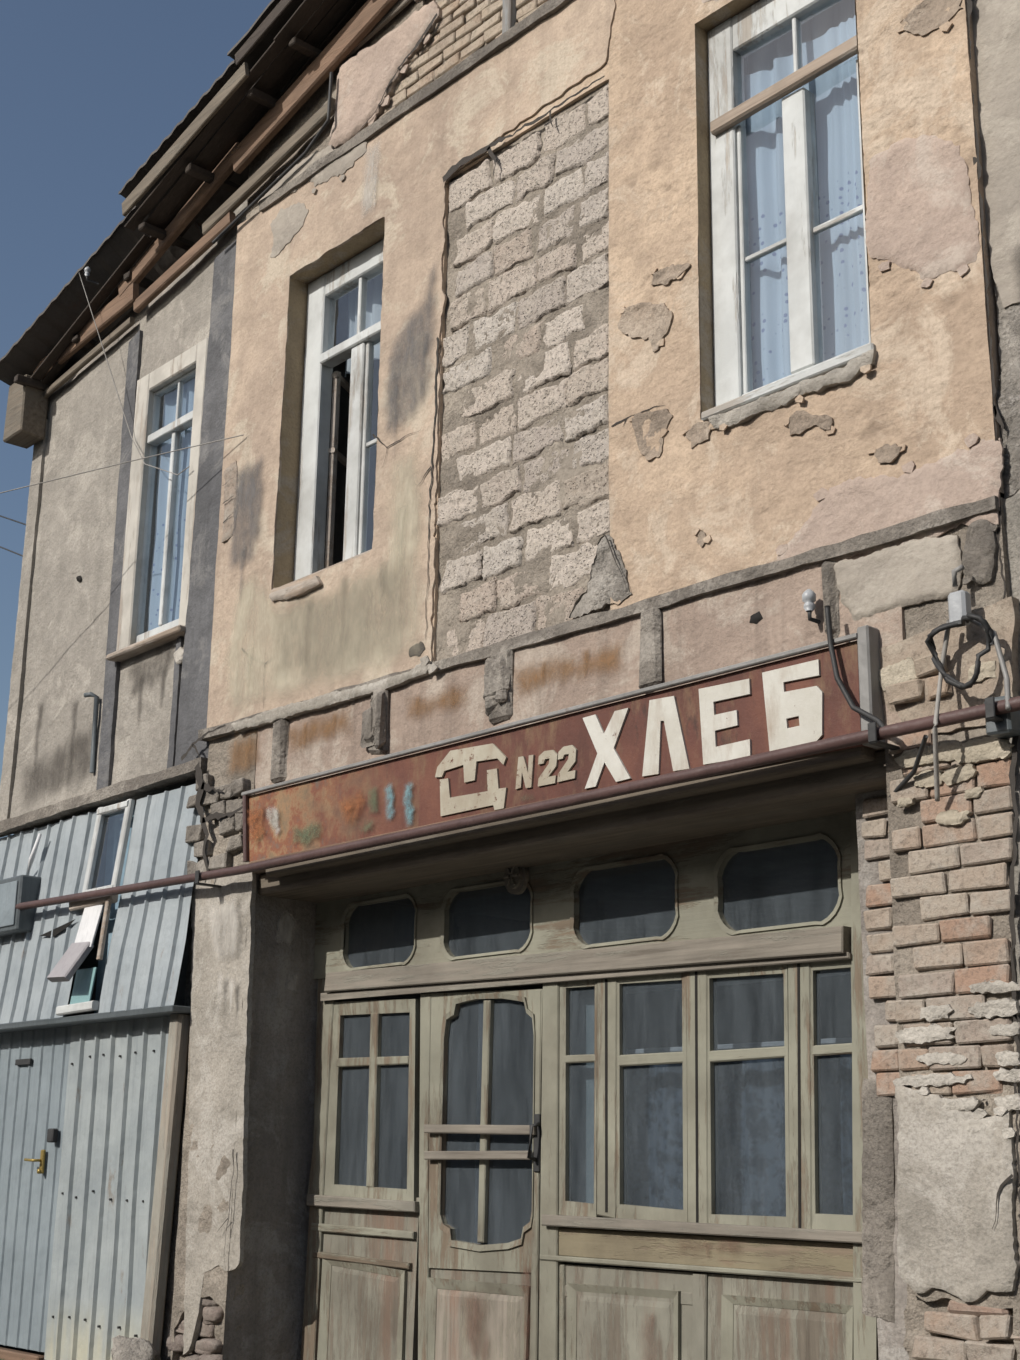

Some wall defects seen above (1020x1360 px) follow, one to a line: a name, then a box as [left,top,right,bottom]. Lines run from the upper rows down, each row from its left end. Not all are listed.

flaking render [258,0,442,258]
crack [442,75,605,182]
spalling [628,409,728,461]
spalling [782,395,836,436]
flaking render [776,433,1004,576]
spalling [185,774,279,875]
flaking render [879,596,1020,1360]